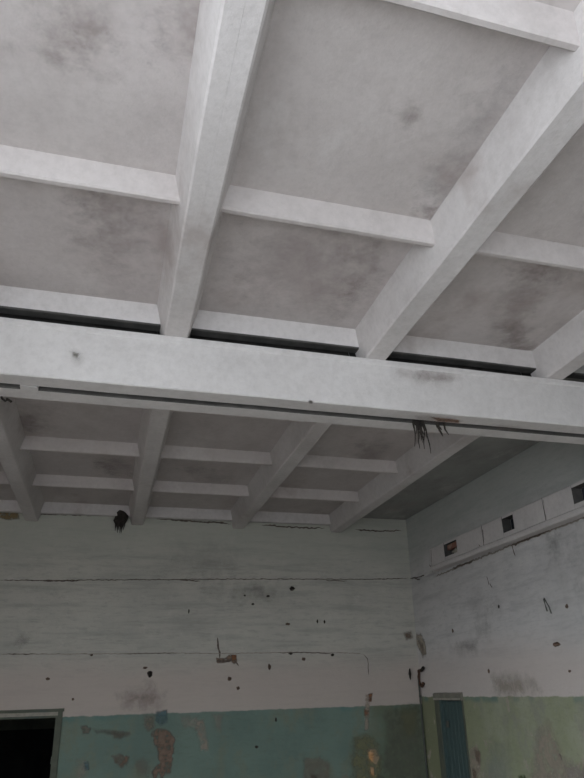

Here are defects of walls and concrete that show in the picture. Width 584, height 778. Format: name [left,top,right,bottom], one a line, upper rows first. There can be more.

crack [6,500,584,582]
crack [2,652,369,674]
peeling [145,710,175,778]